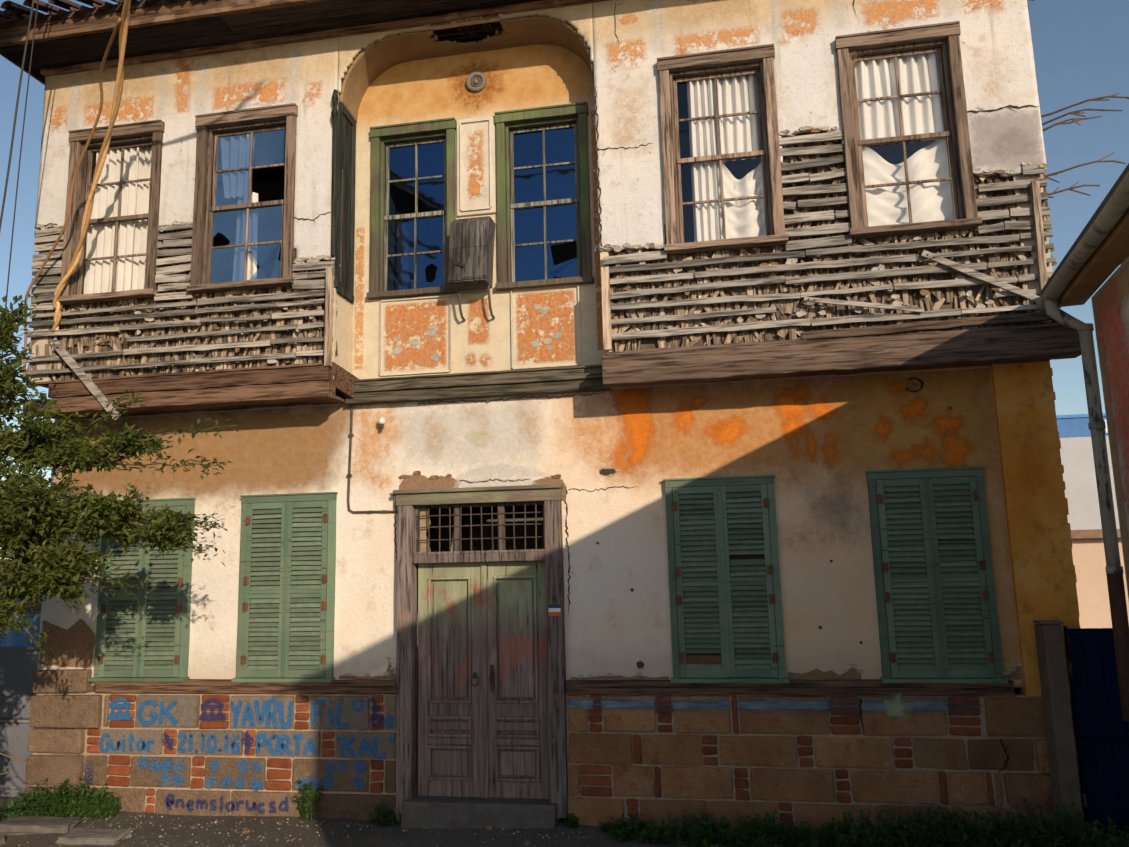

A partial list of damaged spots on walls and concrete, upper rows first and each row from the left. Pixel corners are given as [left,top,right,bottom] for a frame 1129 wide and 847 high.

peeling [676,29,756,54]
peeling [864,0,937,24]
peeling [214,80,283,109]
crack [967,105,1039,113]
peeling [591,111,664,350]
peeling [385,302,446,370]
peeling [517,291,575,362]
peeling [573,388,654,476]
peeling [774,385,837,466]
peeling [874,377,970,468]
crack [564,486,637,612]
spalling [39,619,95,669]